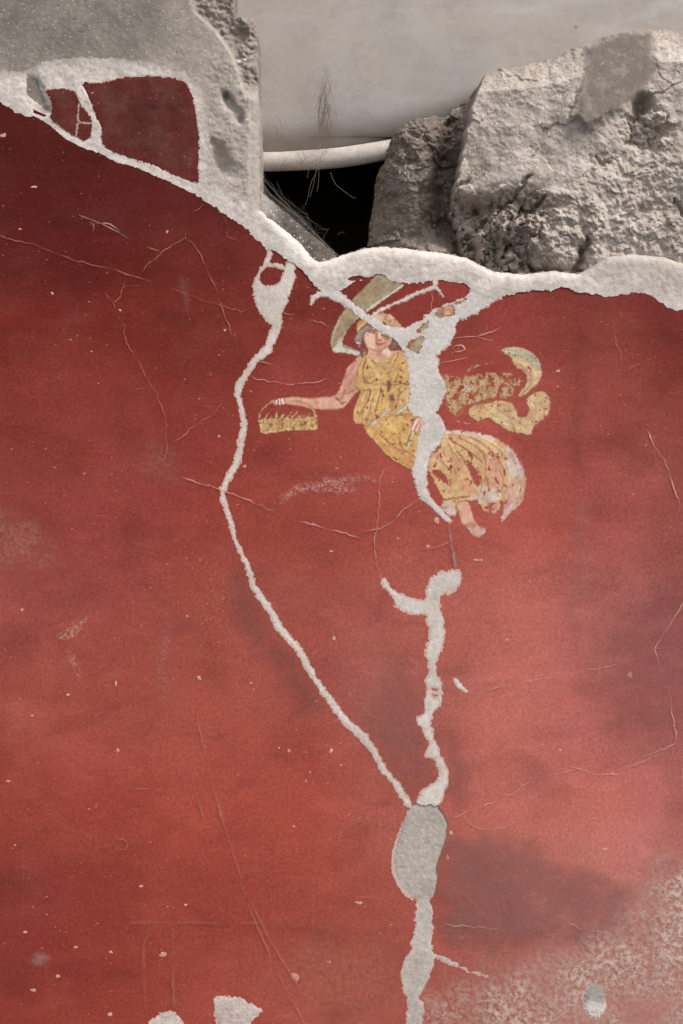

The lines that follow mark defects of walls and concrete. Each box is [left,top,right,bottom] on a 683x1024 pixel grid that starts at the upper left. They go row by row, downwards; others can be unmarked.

spalling [267,29,683,274]
spalling [310,290,502,524]
crack [65,236,460,808]
crack [567,709,677,775]
spalling [149,1011,184,1024]
spalling [214,996,262,1024]
efflorescence [431,870,683,1024]